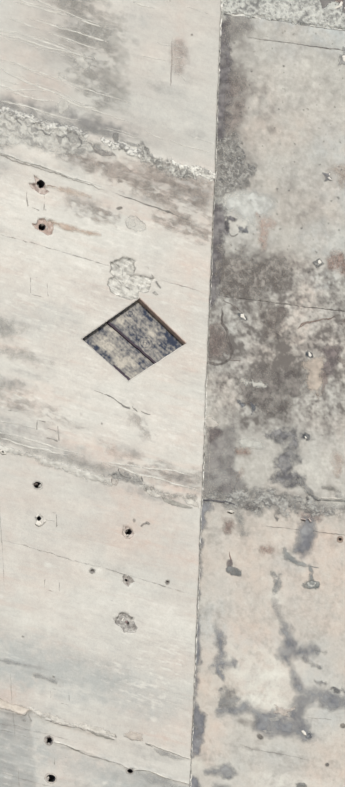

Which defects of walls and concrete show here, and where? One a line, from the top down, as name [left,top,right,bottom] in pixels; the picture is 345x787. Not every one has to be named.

spalling [107,257,160,299]
spalling [162,0,345,787]
leakage [237,357,323,415]
leakage [265,429,313,495]
leakage [199,428,245,577]
leakage [284,518,318,581]
spalling [114,612,137,633]
leakage [281,626,318,662]
leakage [191,622,205,757]
leakage [212,632,345,741]
crack [47,720,152,747]
leakage [205,765,234,779]